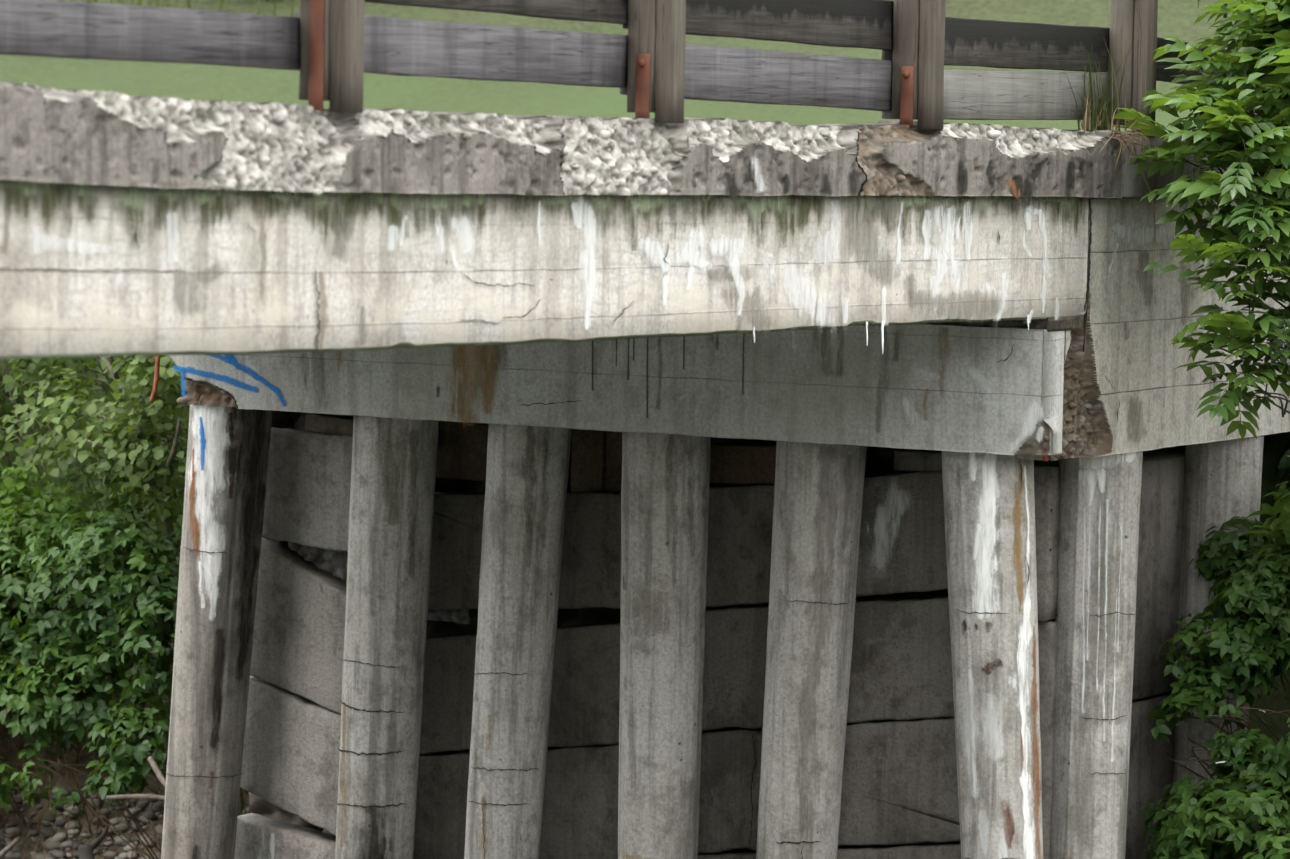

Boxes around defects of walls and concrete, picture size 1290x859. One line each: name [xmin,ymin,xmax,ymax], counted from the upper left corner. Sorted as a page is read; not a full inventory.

spalling [23,83,1111,196]
spalling [167,356,238,408]
rust [437,345,496,423]
damp [641,230,771,394]
damp [1016,158,1057,323]
spalling [1014,232,1113,461]
damp [190,405,270,748]
damp [969,446,1012,619]
damp [1077,405,1141,629]
rust [1006,807,1015,848]
damp [1013,468,1035,859]
rust [1021,627,1040,859]